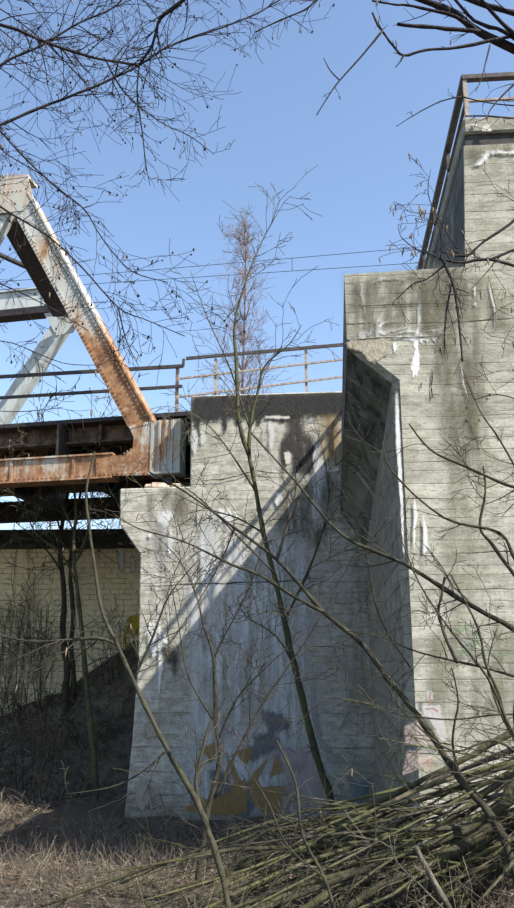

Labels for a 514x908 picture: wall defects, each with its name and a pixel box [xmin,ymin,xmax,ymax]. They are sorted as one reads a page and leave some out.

water stain [466,144,514,166]
water stain [149,490,186,554]
efflorescence [191,426,206,453]
water stain [268,417,332,660]
efflorescence [395,394,429,554]
water stain [353,272,479,457]
water stain [145,620,178,696]
water stain [190,508,238,761]
water stain [269,547,285,702]